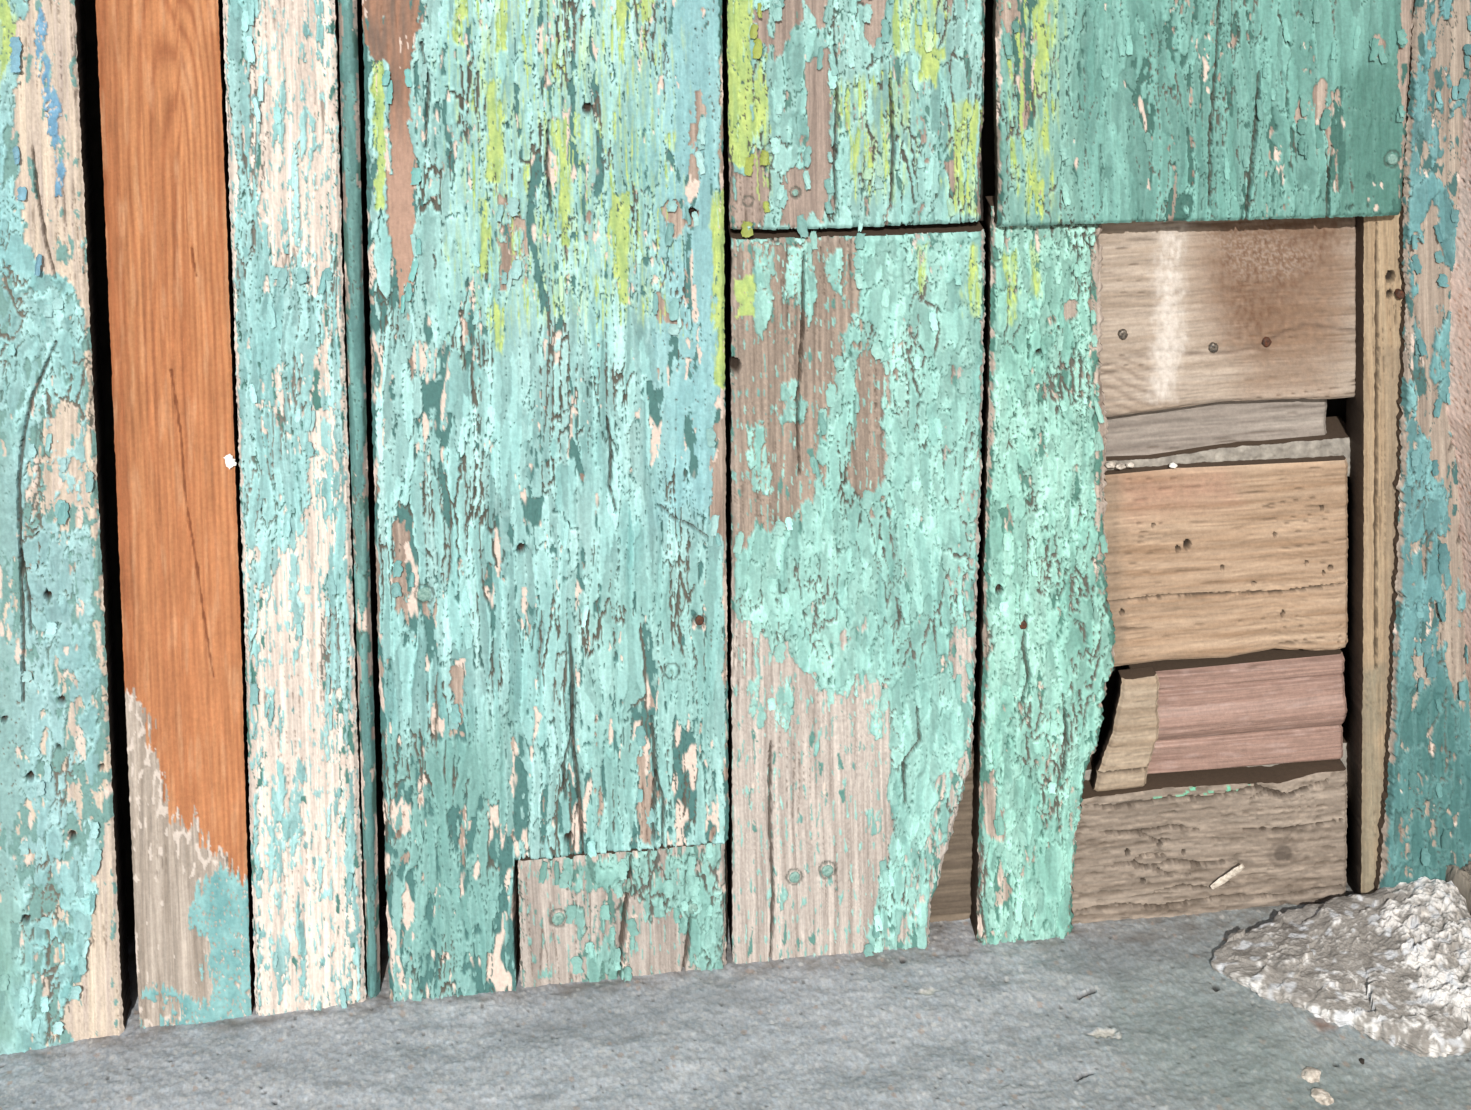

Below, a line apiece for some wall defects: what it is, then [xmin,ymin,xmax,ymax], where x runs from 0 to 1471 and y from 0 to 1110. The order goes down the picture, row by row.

peeling [9,0,90,317]
peeling [241,0,337,329]
peeling [362,0,427,314]
crack [795,251,807,476]
peeling [706,0,944,554]
peeling [1406,205,1459,359]
peeling [18,403,355,1041]
peeling [519,605,917,988]
peeling [944,579,976,699]
peeling [979,769,1006,844]
crack [1018,614,1344,913]
peeling [1413,513,1468,713]